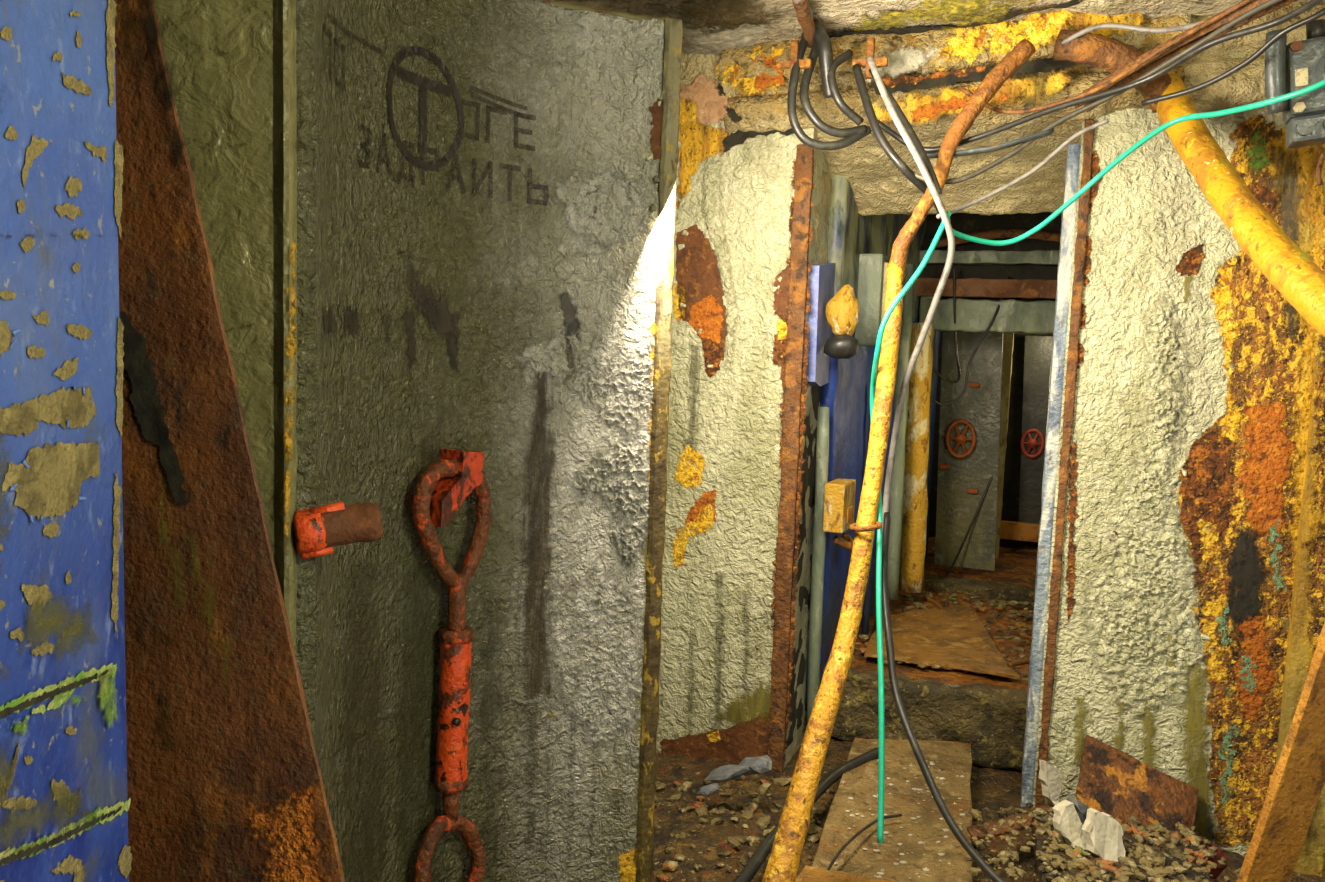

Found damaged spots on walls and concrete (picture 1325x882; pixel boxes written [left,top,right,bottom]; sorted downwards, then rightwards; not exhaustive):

water stain [663,0,786,97]
peeling [5,126,53,214]
peeling [85,140,124,238]
corrosion [1229,112,1325,272]
peeling [116,317,124,436]
corrosion [281,242,297,547]
peeling [0,357,122,638]
water stain [523,371,555,695]
corrosion [1169,243,1325,847]
water stain [26,601,94,655]
water stain [0,790,91,848]
corrosion [244,785,343,882]